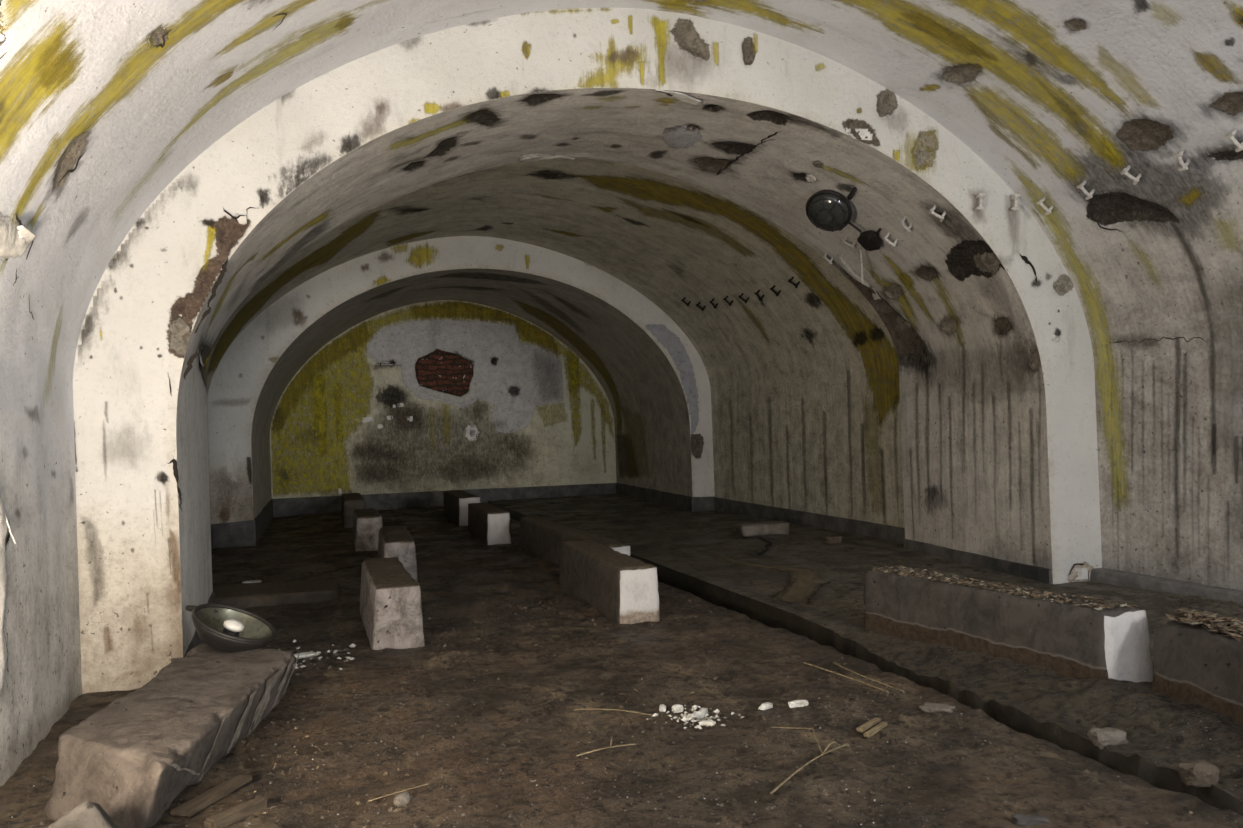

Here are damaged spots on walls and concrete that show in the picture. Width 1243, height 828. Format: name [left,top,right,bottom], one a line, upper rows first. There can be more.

damp [38,34,78,86]
damp [903,14,996,61]
damp [979,107,1035,167]
spalling [1074,117,1243,232]
spalling [1209,91,1243,116]
peeling [0,213,37,261]
spalling [915,206,1013,283]
spalling [166,208,251,396]
flaking render [415,349,477,404]
damp [1176,228,1216,473]
damp [357,386,527,483]
damp [1175,339,1186,547]